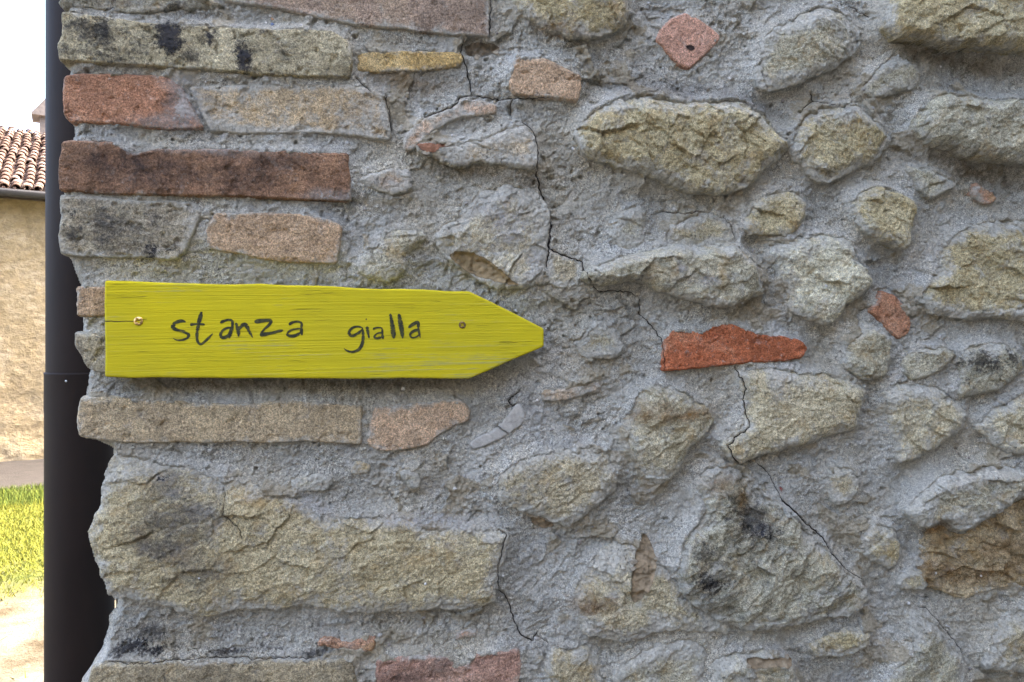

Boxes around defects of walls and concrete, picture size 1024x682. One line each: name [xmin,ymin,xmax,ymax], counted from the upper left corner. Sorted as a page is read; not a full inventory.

crack [425,0,665,369]
crack [727,369,862,579]
crack [497,529,549,644]